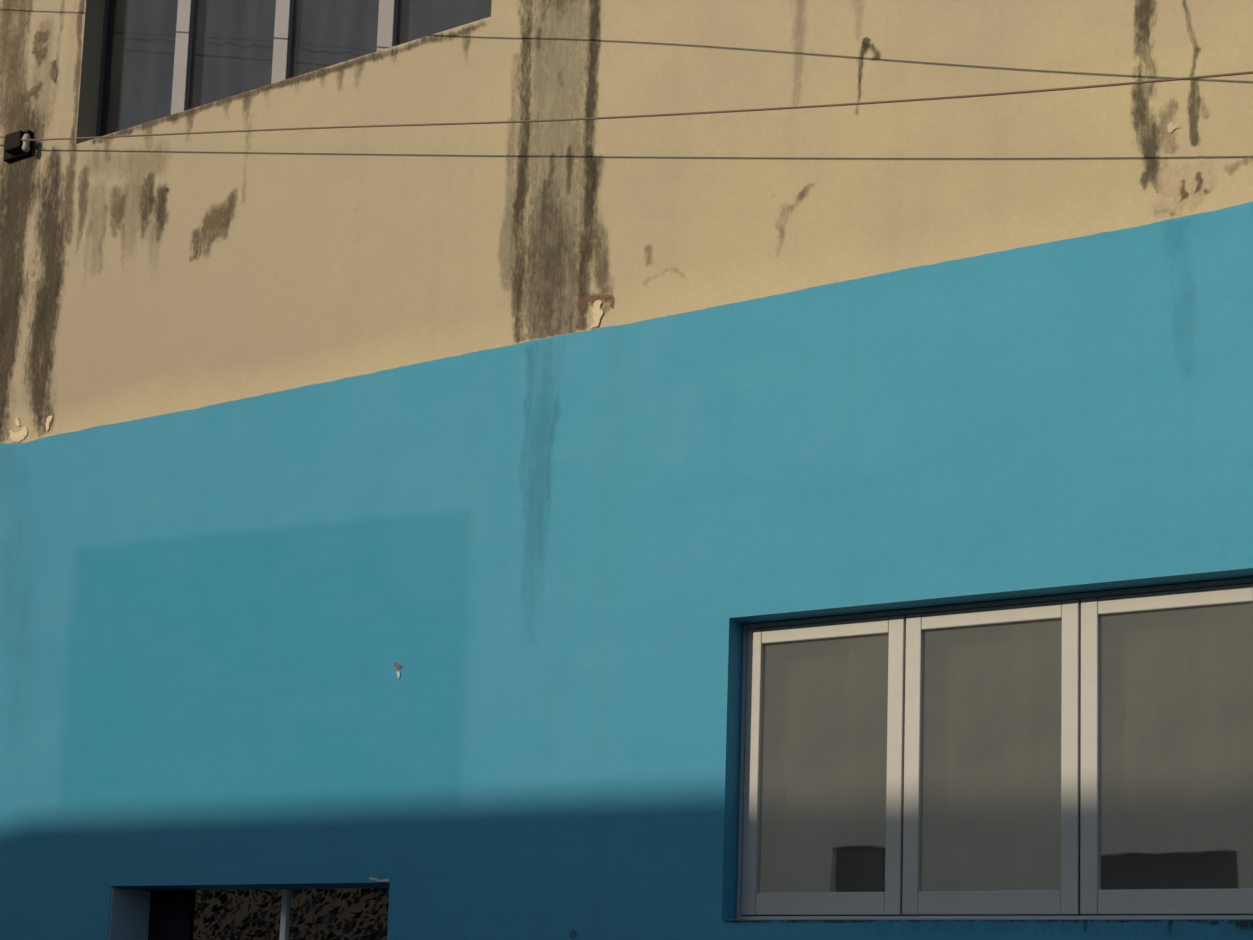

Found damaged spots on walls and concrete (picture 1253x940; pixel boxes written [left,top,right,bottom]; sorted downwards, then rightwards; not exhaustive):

water stain [1134,0,1154,55]
water stain [92,24,477,144]
water stain [1132,71,1172,189]
water stain [498,0,607,342]
water stain [0,0,87,442]
water stain [140,174,168,238]
water stain [192,189,236,258]
peeling [578,294,614,329]
peeling [9,417,27,442]